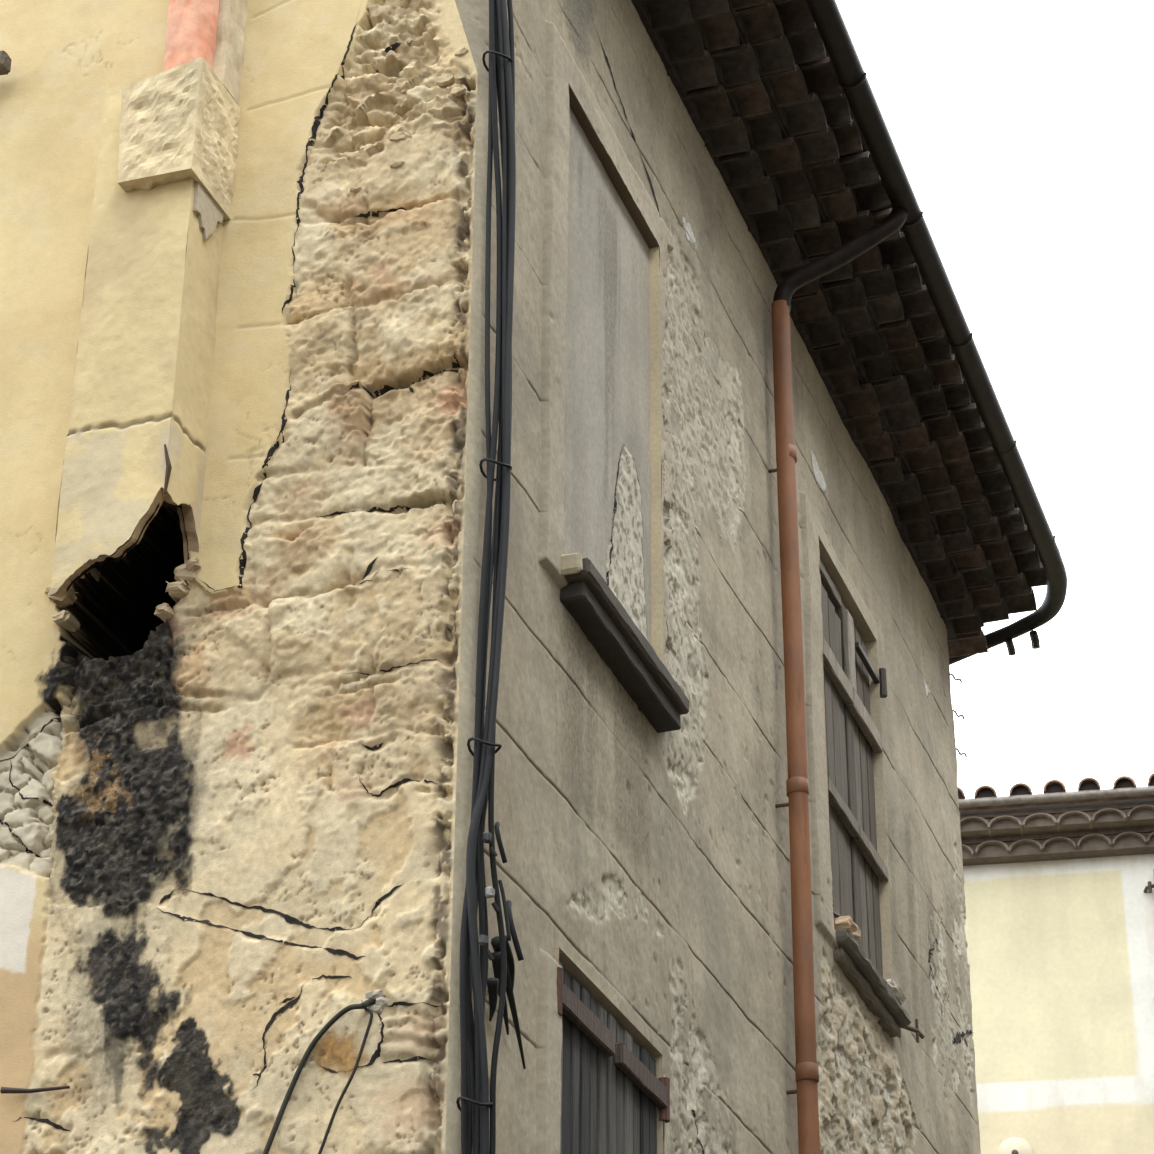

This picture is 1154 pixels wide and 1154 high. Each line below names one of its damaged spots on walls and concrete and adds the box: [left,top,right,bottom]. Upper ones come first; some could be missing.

crack [282,0,363,313]
crack [355,207,406,218]
crack [197,368,293,591]
spalling [22,0,478,1154]
spalling [606,446,648,641]
spalling [659,217,746,814]
crack [0,704,71,807]
water stain [77,916,186,1095]
crack [156,884,403,1091]
crack [315,1001,442,1073]
spalling [665,955,732,1154]
spalling [816,947,918,1154]